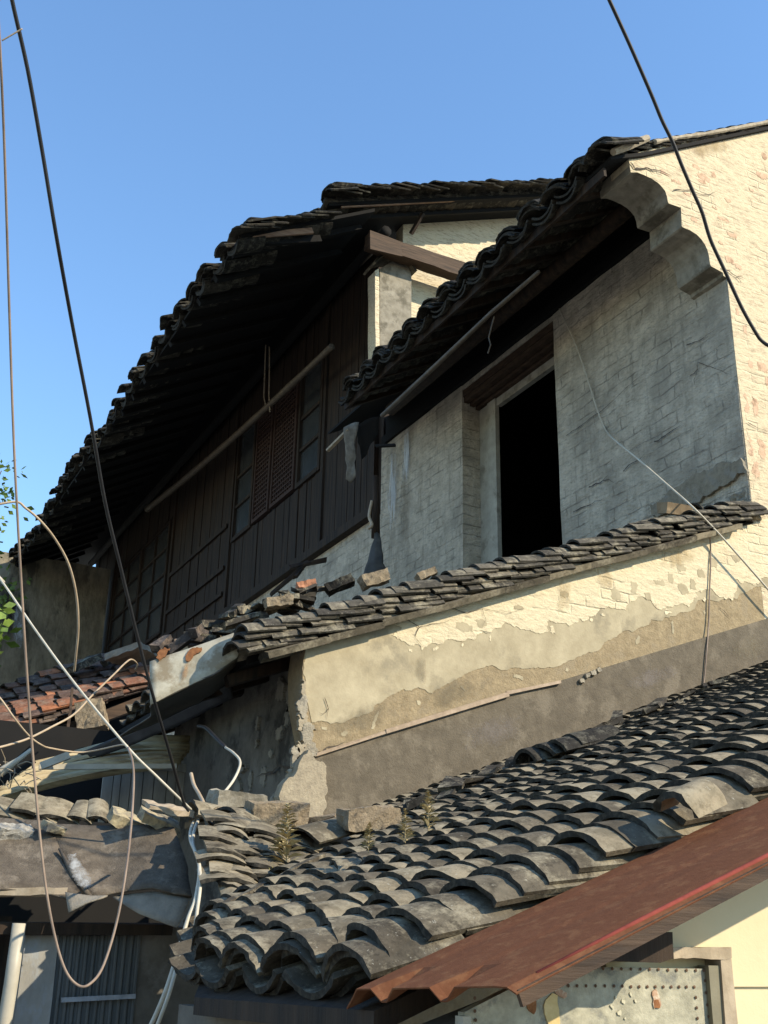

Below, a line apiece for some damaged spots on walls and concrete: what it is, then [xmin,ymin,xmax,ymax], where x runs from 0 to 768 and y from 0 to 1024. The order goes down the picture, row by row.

crack [573,425,681,512]
flaking render [233,516,768,801]